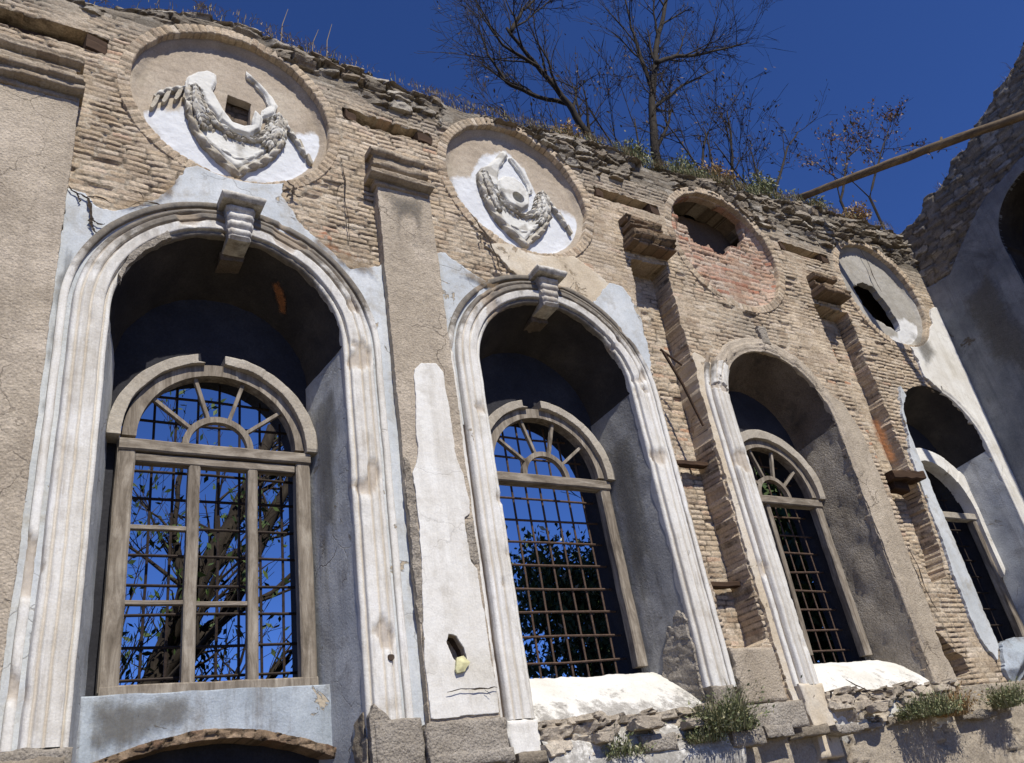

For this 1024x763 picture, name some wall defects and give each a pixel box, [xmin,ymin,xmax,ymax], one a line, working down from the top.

crack [69,186,166,239]
peeling [118,230,172,284]
spalling [567,166,1008,701]
corrosion [872,420,894,461]
crack [449,685,495,693]